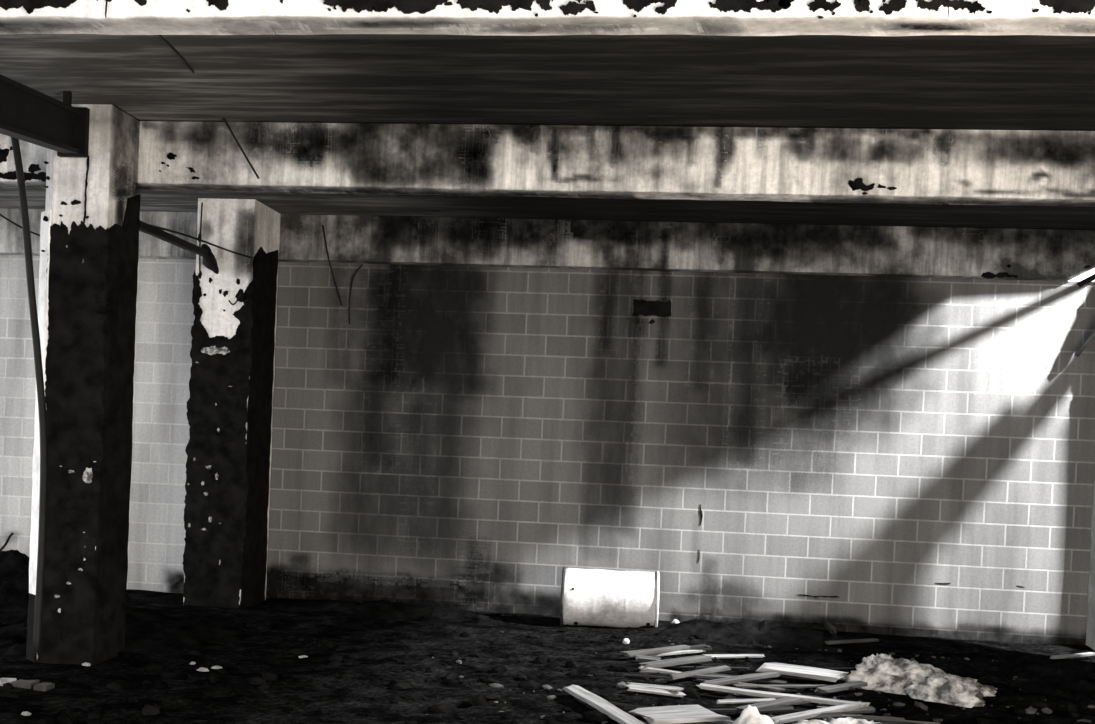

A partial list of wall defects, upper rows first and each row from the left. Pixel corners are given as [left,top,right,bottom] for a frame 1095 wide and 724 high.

peeling [0,0,77,14]
peeling [206,0,229,11]
peeling [323,0,598,17]
peeling [623,0,677,18]
peeling [709,0,794,13]
peeling [807,0,841,19]
peeling [854,0,992,15]
peeling [1032,0,1095,15]
damp [295,121,326,168]
damp [517,124,597,181]
damp [790,134,813,155]
damp [356,130,524,196]